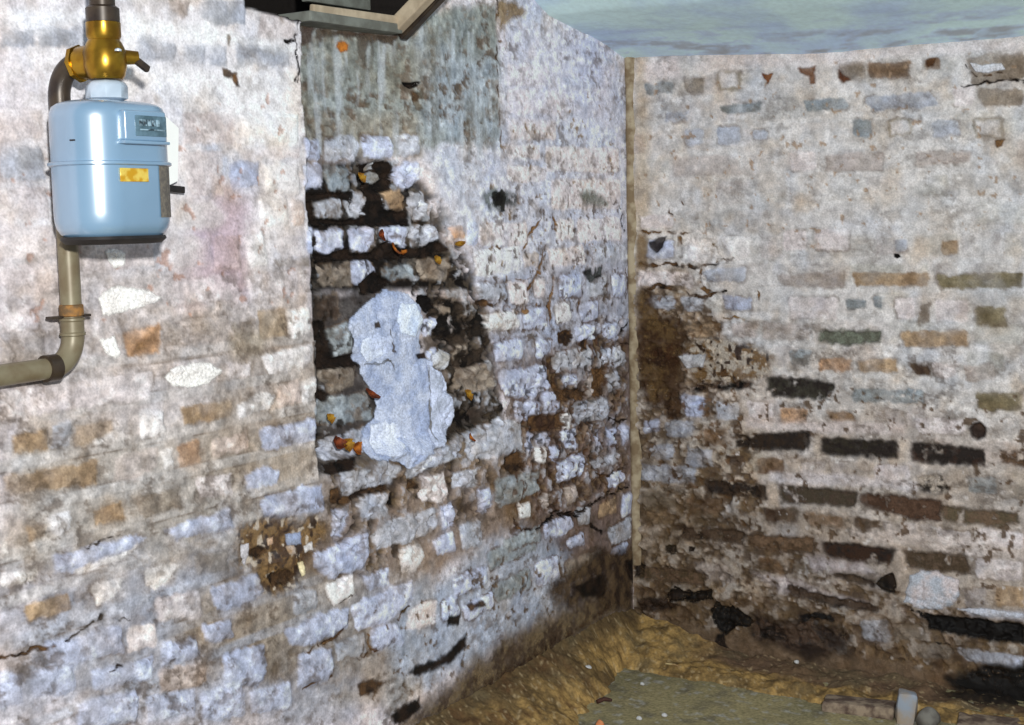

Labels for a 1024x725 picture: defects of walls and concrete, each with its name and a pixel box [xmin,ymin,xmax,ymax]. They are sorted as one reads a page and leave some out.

spalling [305,161,409,227]
spalling [312,240,448,295]
damp [637,236,647,266]
spalling [312,320,357,373]
spalling [416,295,503,437]
damp [636,290,687,418]
spalling [330,484,391,505]
crack [513,464,628,533]
spalling [239,516,326,594]
damp [715,634,728,648]
damp [752,612,851,660]
damp [946,664,1024,701]